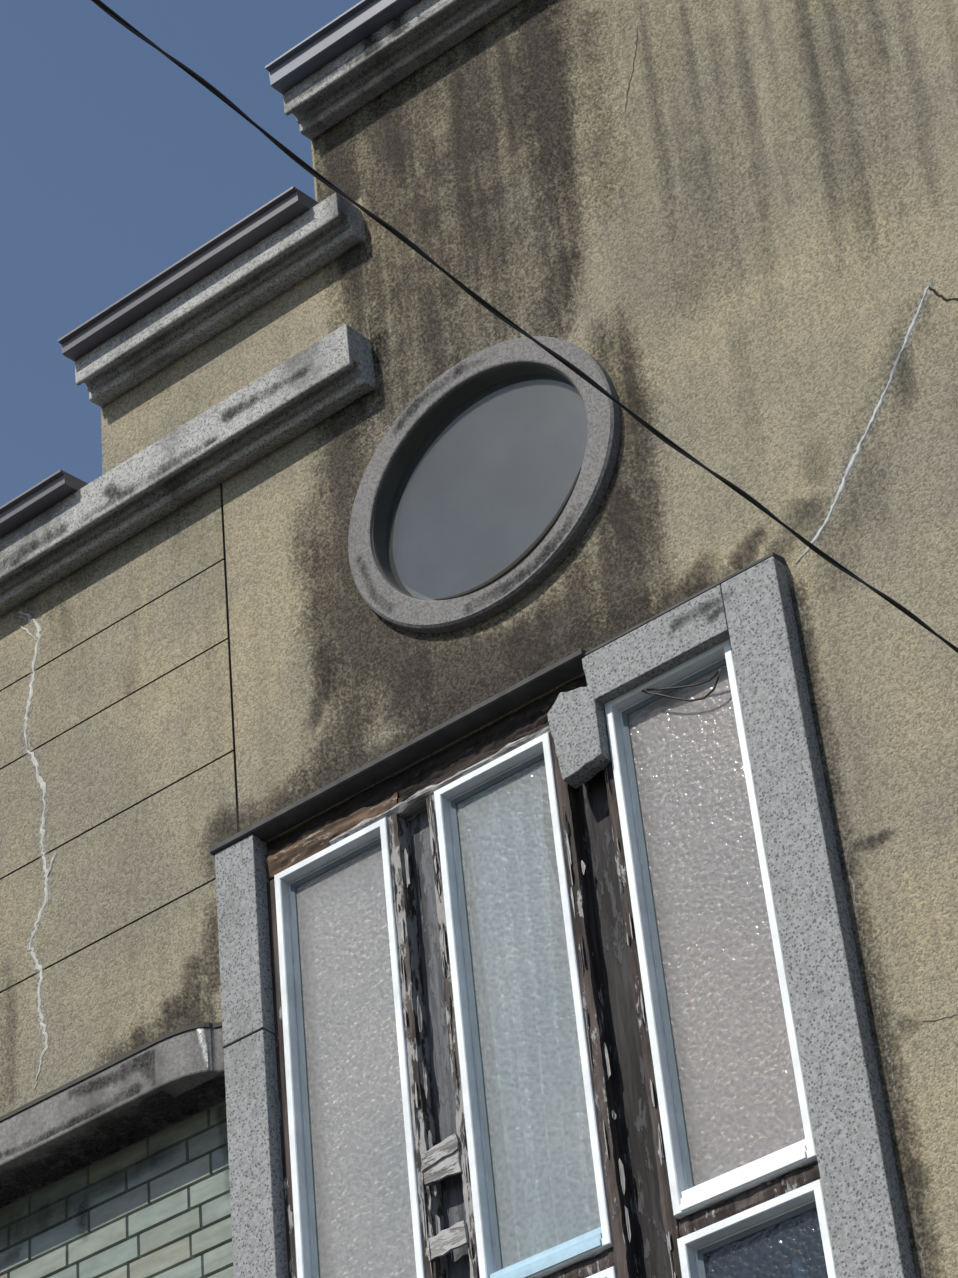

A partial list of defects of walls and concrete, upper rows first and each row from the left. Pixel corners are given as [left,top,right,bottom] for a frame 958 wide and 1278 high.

damp [298,0,659,782]
crack [796,286,958,564]
damp [731,527,784,569]
crack [19,610,57,1090]
spalling [265,675,612,894]
peeling [565,816,585,920]
peeling [392,849,422,1033]
damp [197,1028,208,1067]
peeling [412,1065,433,1149]
peeling [585,1011,611,1080]
peeling [422,1172,440,1278]
peeling [603,1110,631,1242]